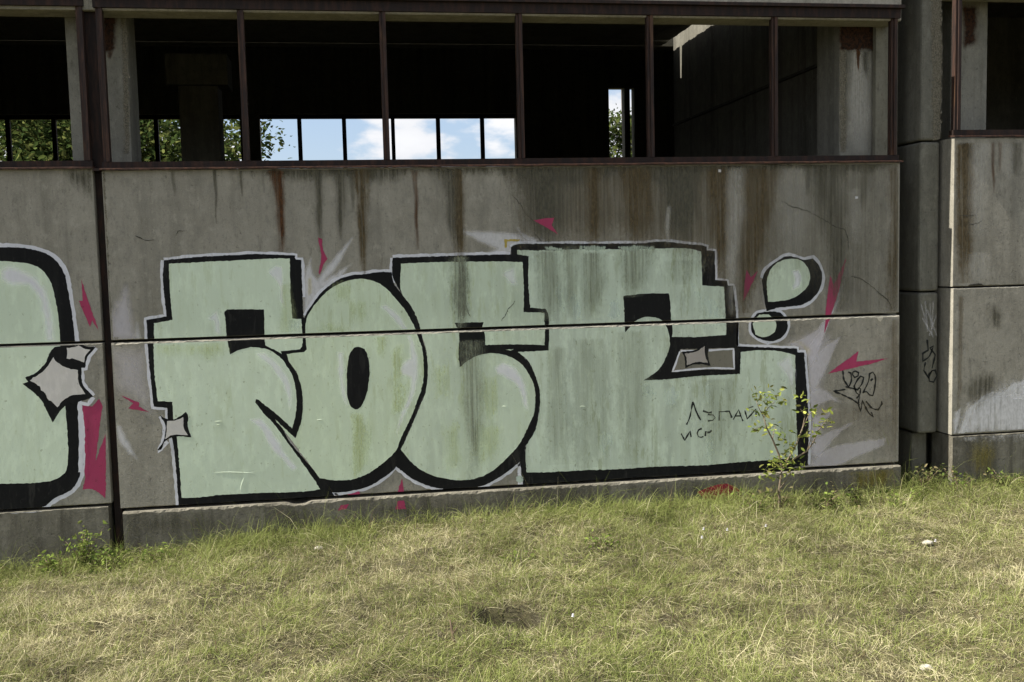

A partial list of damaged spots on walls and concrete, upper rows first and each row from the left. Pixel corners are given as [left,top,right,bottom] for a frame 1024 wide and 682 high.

rust [839,27,873,119]
rust [269,170,285,244]
leakage [267,169,413,269]
leakage [429,164,885,328]